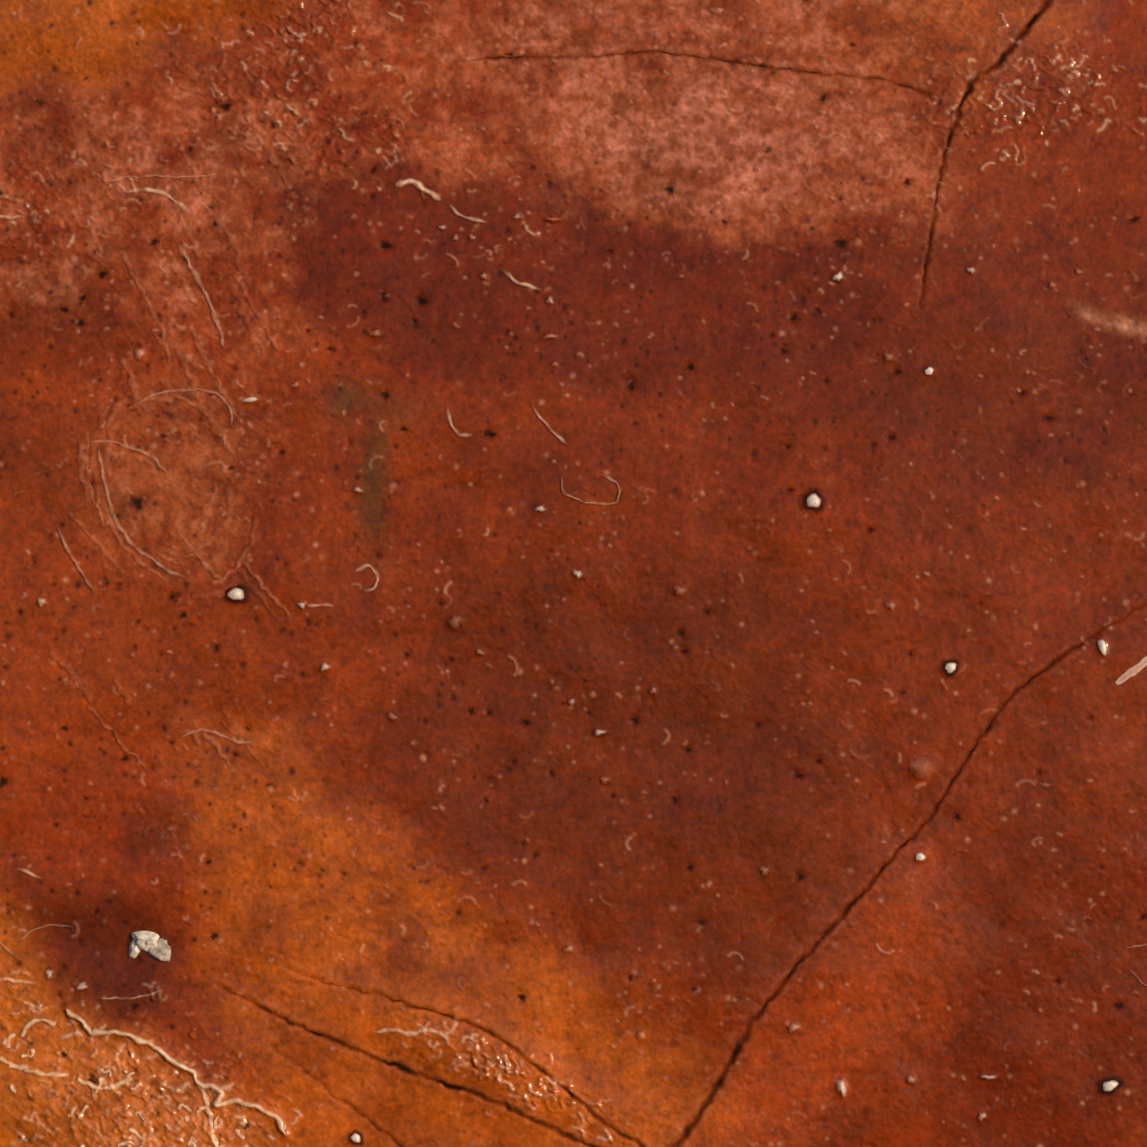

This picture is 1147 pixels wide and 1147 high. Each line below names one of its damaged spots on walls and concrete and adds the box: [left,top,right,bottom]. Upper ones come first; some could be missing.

crack [455,0,1053,307]
corrosion [938,0,1120,153]
corrosion [0,926,52,1147]
corrosion [150,696,999,1147]
crack [218,603,1147,1147]